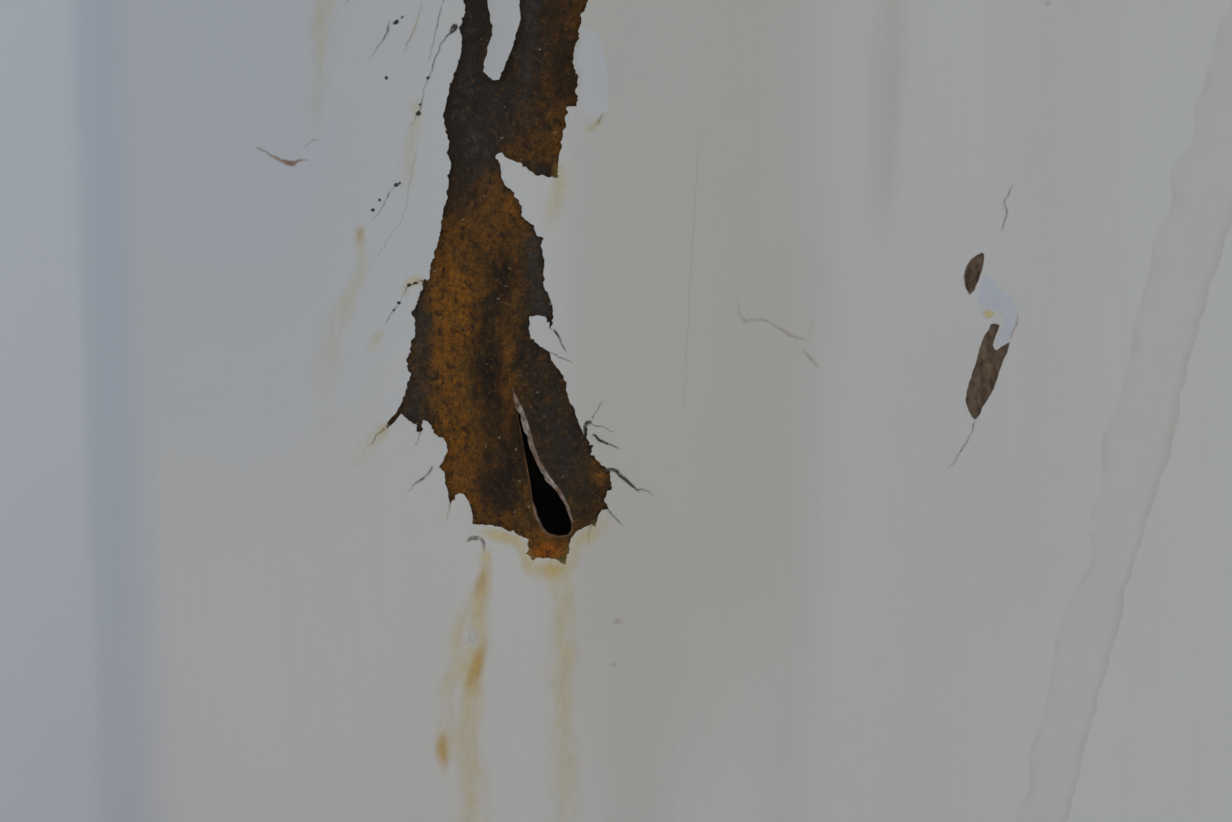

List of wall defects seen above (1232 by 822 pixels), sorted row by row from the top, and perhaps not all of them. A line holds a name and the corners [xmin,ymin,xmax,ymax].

corrosion [375,0,646,565]
peeling [964,253,1018,430]